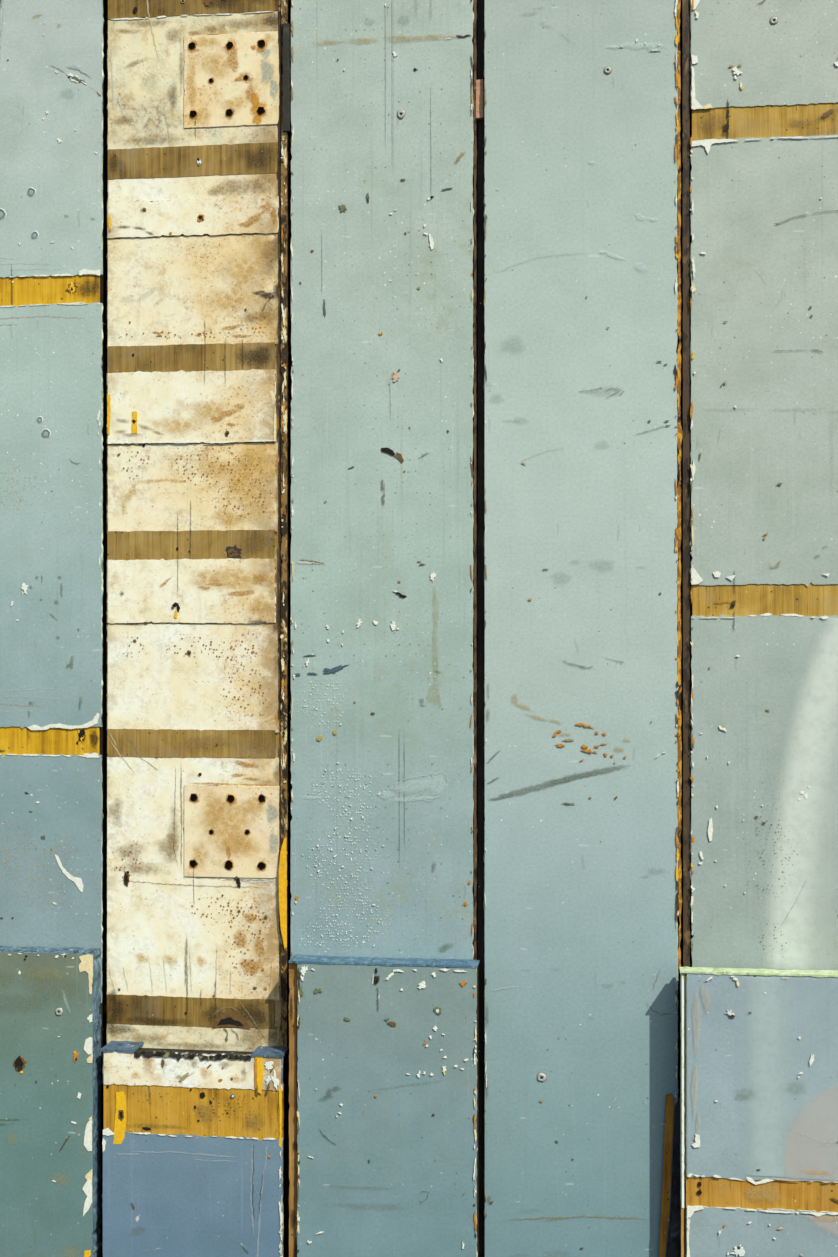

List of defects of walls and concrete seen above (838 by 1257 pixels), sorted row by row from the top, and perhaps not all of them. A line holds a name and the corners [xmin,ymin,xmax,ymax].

spalling [181,0,294,60]
corrosion [188,31,266,124]
peeling [619,0,838,163]
corrosion [123,448,282,520]
corrosion [169,634,266,715]
peeling [0,713,100,758]
corrosion [553,723,627,763]
corrosion [202,761,264,808]
peeling [675,805,718,951]
corrosion [191,894,268,990]
peeling [84,1037,93,1063]
peeling [83,1169,92,1216]